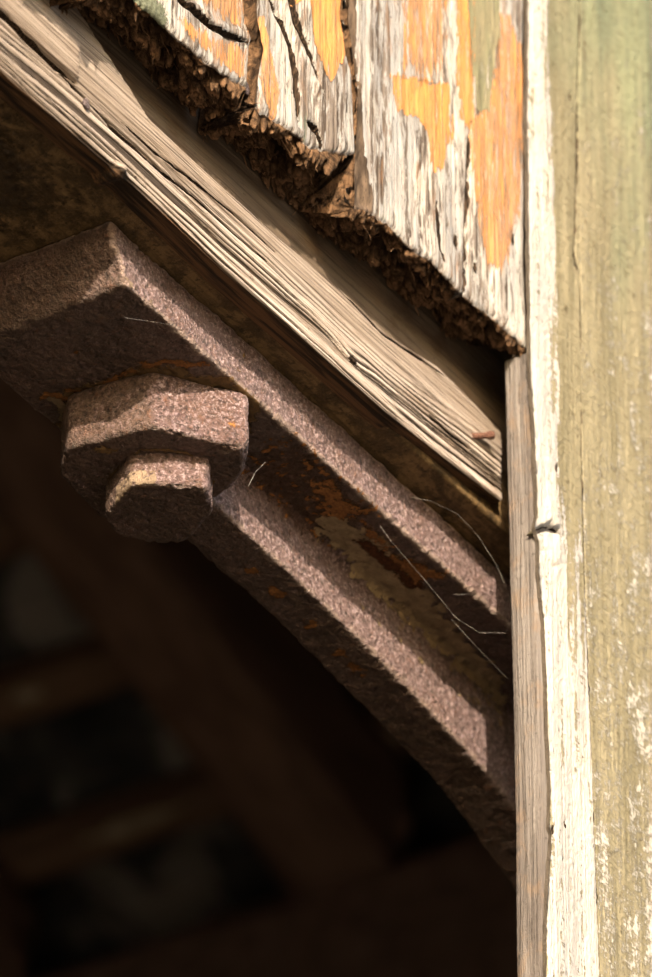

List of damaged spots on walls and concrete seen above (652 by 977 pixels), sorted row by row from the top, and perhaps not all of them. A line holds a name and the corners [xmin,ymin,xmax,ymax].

crack [0,10,274,262]
crack [177,0,248,44]
peeling [179,0,280,121]
crack [268,0,324,151]
peeling [290,0,345,81]
rust [39,359,260,434]
peeling [390,0,652,977]
rust [241,432,509,729]